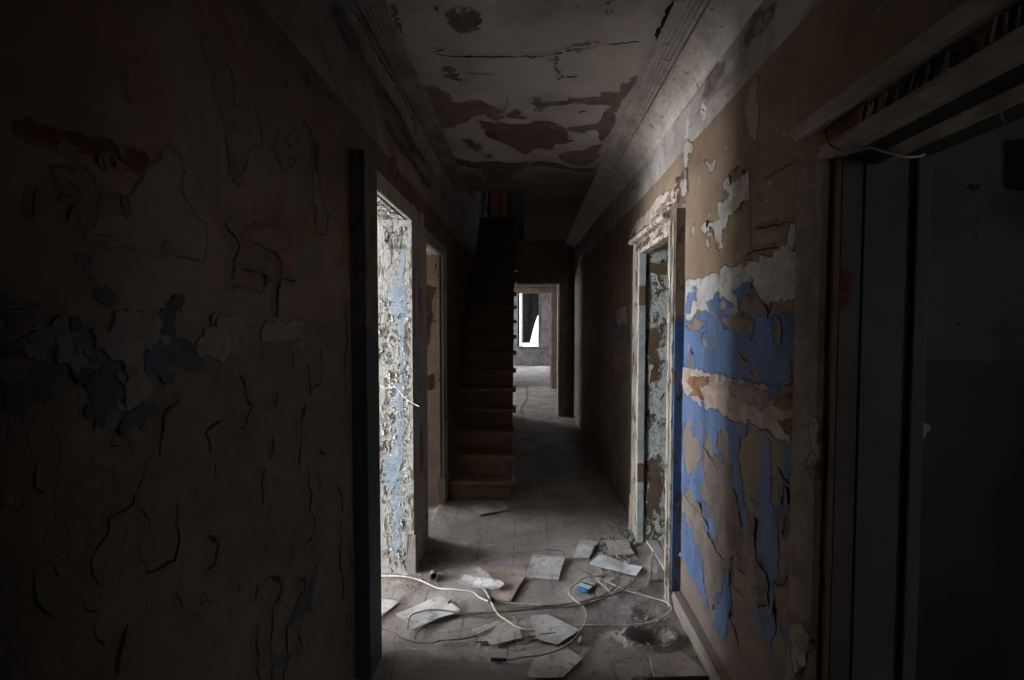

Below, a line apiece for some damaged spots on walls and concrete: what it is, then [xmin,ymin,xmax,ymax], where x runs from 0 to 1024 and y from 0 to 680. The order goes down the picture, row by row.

peeling [444,6,485,34]
crack [425,0,675,79]
peeling [423,64,638,181]
peeling [377,201,406,253]
flaking render [629,139,797,497]
peeling [378,295,409,565]
peeling [644,453,664,522]
flaking render [680,427,759,640]